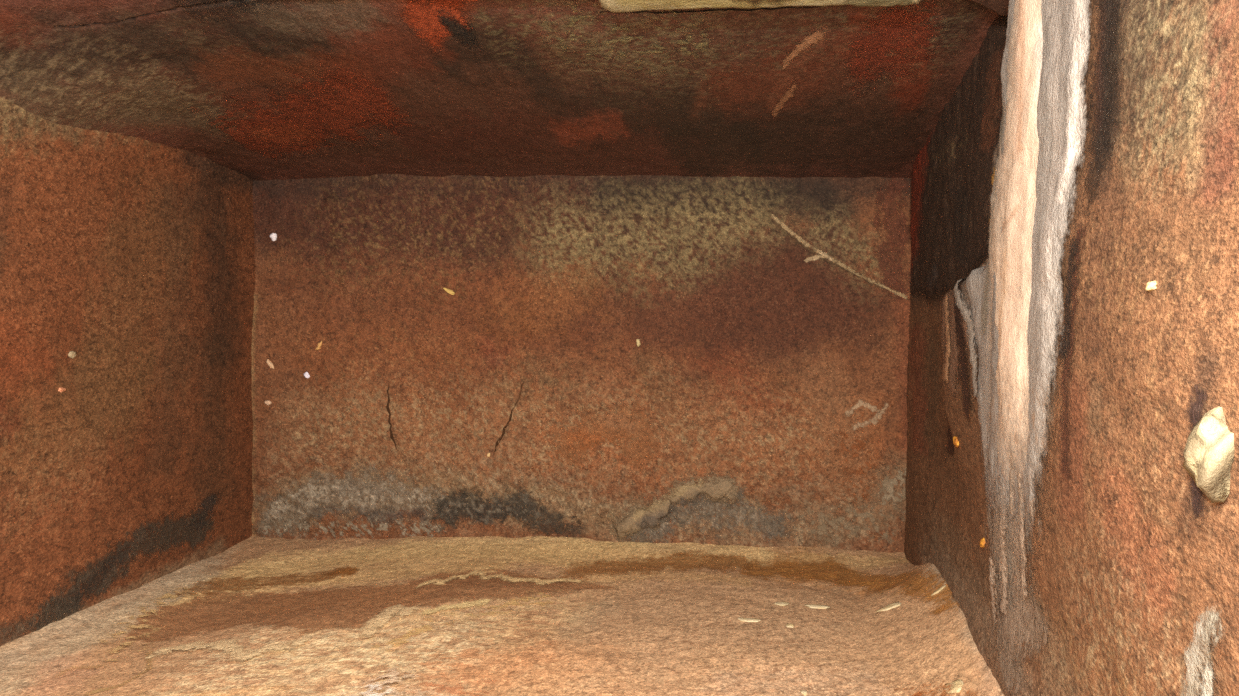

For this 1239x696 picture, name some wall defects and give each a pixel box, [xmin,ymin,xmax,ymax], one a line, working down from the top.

crack [54,0,306,28]
rust [403,0,479,51]
crack [600,6,823,14]
spalling [909,15,1008,420]
crack [386,382,397,450]
crack [494,383,523,452]
damp [255,464,584,539]
damp [0,495,219,644]
damp [58,550,751,696]
peeling [876,601,901,612]